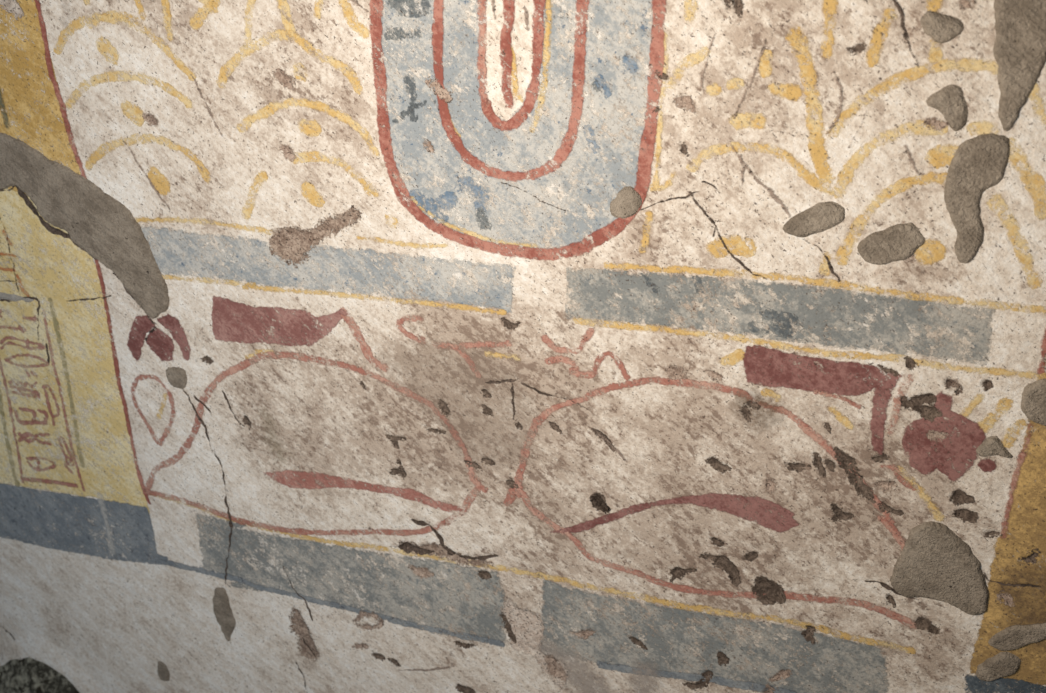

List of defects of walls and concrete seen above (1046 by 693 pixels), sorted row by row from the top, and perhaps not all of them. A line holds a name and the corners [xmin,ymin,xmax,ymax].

spalling [723,0,743,18]
spalling [959,0,976,10]
crack [892,0,918,66]
spalling [847,43,867,56]
spalling [272,69,295,90]
spalling [672,93,695,113]
spalling [142,111,158,127]
spalling [923,117,949,131]
flaking render [269,205,362,268]
crack [640,181,765,279]
crack [803,239,840,282]
crack [182,388,244,584]